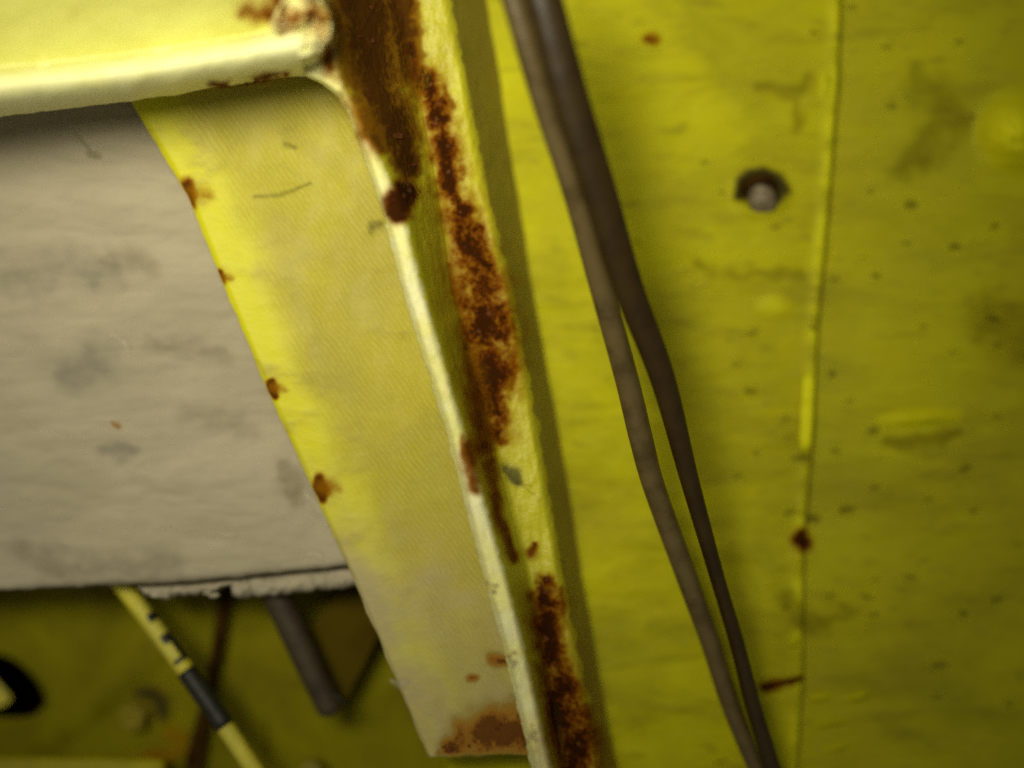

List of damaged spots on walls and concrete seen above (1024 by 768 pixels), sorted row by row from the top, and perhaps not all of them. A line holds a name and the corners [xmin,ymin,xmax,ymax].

corrosion [181,177,209,209]
corrosion [238,0,538,563]
corrosion [790,527,812,552]
corrosion [486,653,508,667]
corrosion [528,575,602,768]
corrosion [759,675,804,693]
corrosion [436,699,528,756]